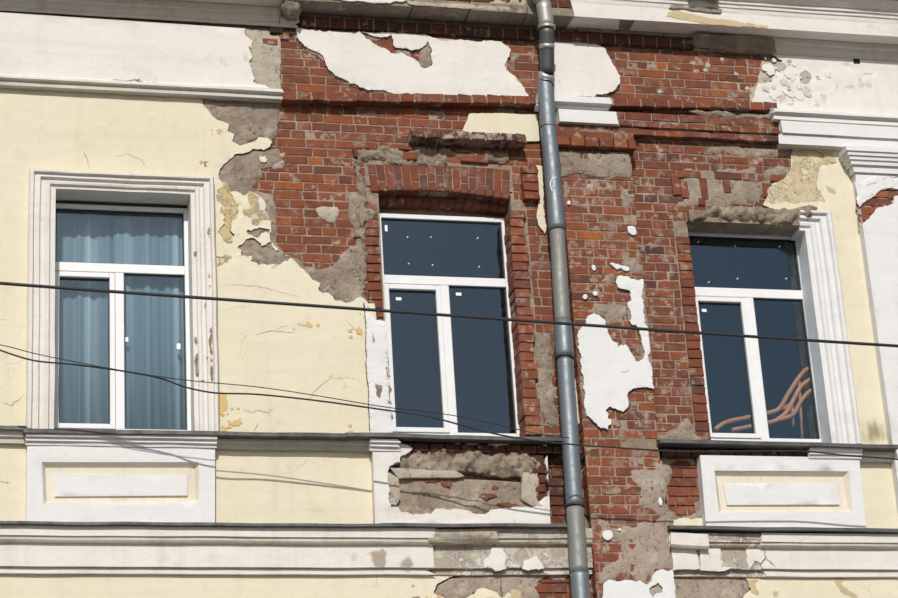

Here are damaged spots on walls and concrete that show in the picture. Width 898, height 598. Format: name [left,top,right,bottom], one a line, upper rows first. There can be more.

spalling [855,176,898,228]
spalling [203,0,873,598]
peeling [194,327,243,432]